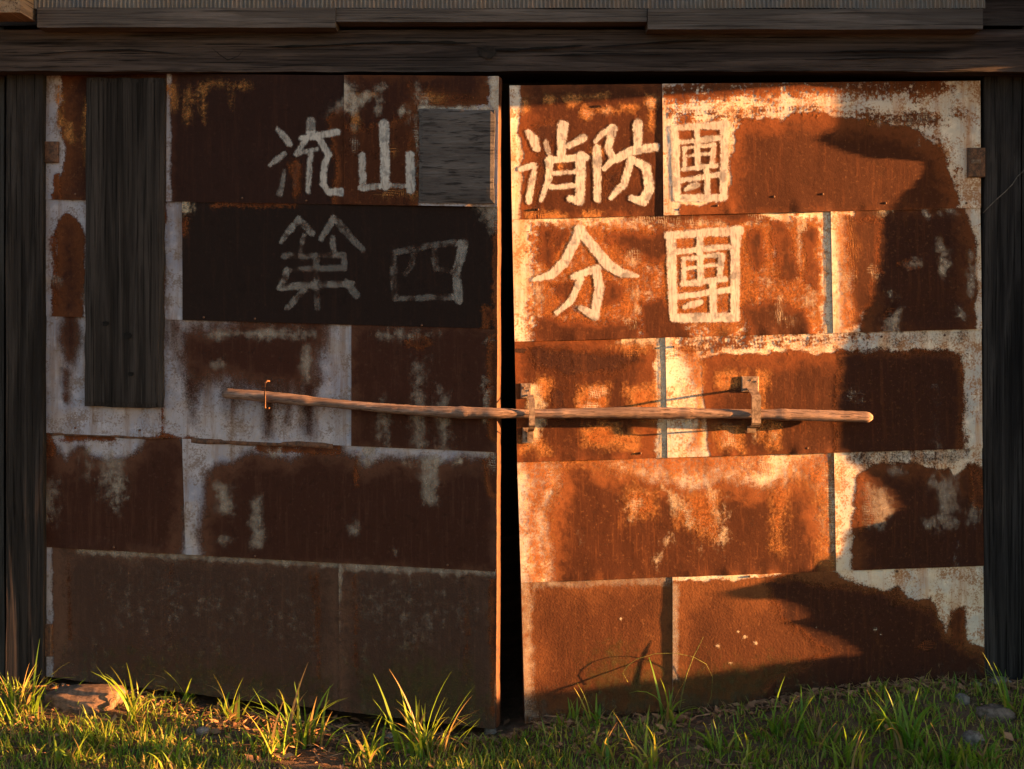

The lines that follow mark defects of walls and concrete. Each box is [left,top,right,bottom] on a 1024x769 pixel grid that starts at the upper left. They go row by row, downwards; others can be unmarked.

corrosion [46,74,499,729]
corrosion [515,81,985,724]